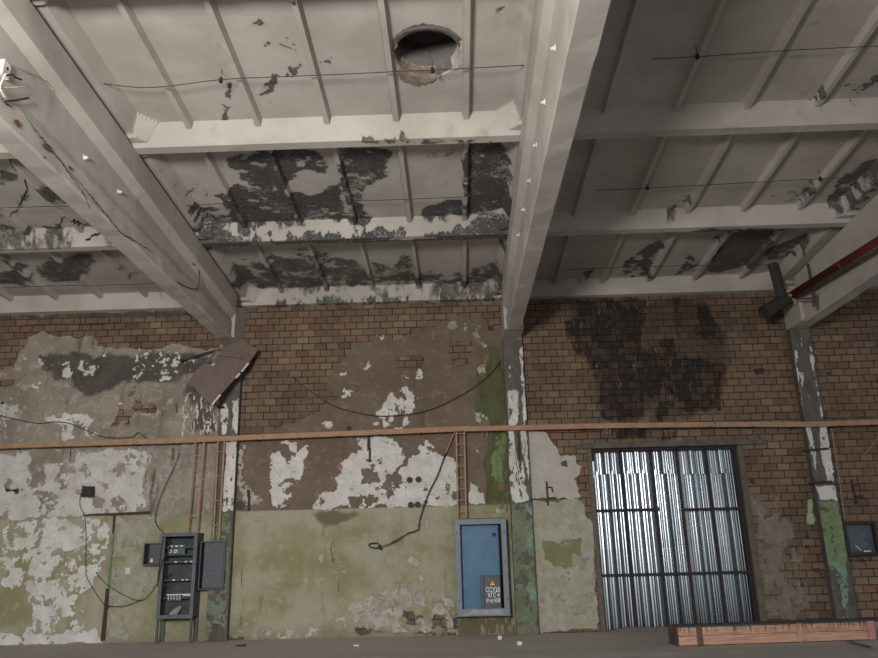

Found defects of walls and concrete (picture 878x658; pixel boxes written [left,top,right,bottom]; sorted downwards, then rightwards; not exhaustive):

spalling [260,64,301,104]
water stain [13,186,65,212]
water stain [0,215,95,286]
crack [0,67,149,250]
water stain [186,142,513,308]
water stain [676,228,810,275]
water stain [827,159,878,214]
water stain [565,297,723,439]
flaking render [0,300,502,645]
flaking render [495,347,599,635]
flaking render [749,478,810,620]
peeling [795,336,849,609]